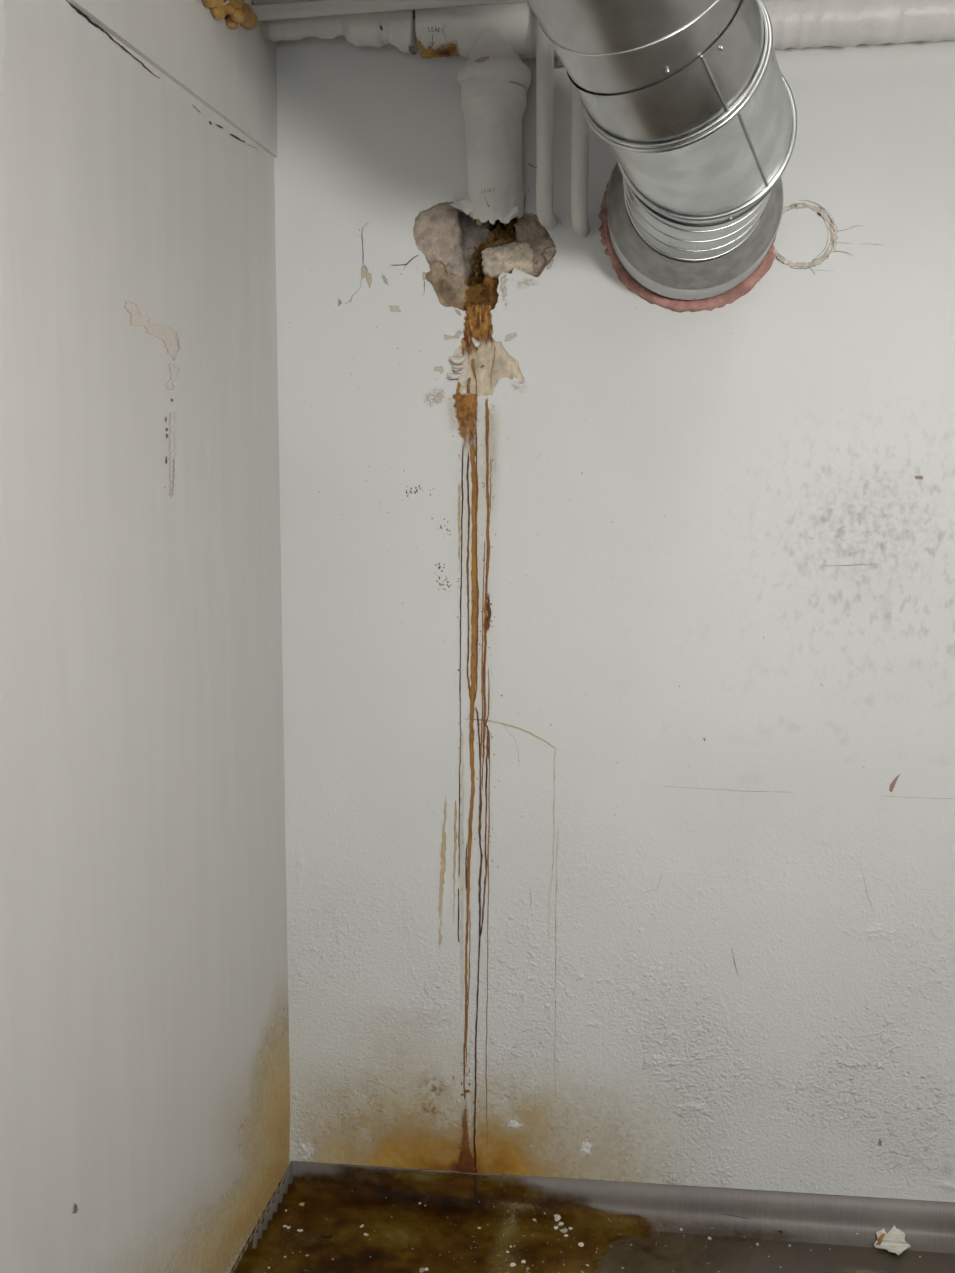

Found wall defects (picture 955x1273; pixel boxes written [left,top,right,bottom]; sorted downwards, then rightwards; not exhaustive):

flaking render [413,196,557,315]
peeling [427,330,525,403]
corrosion [463,305,493,356]
corrosion [231,394,664,1273]
water stain [313,1086,563,1177]